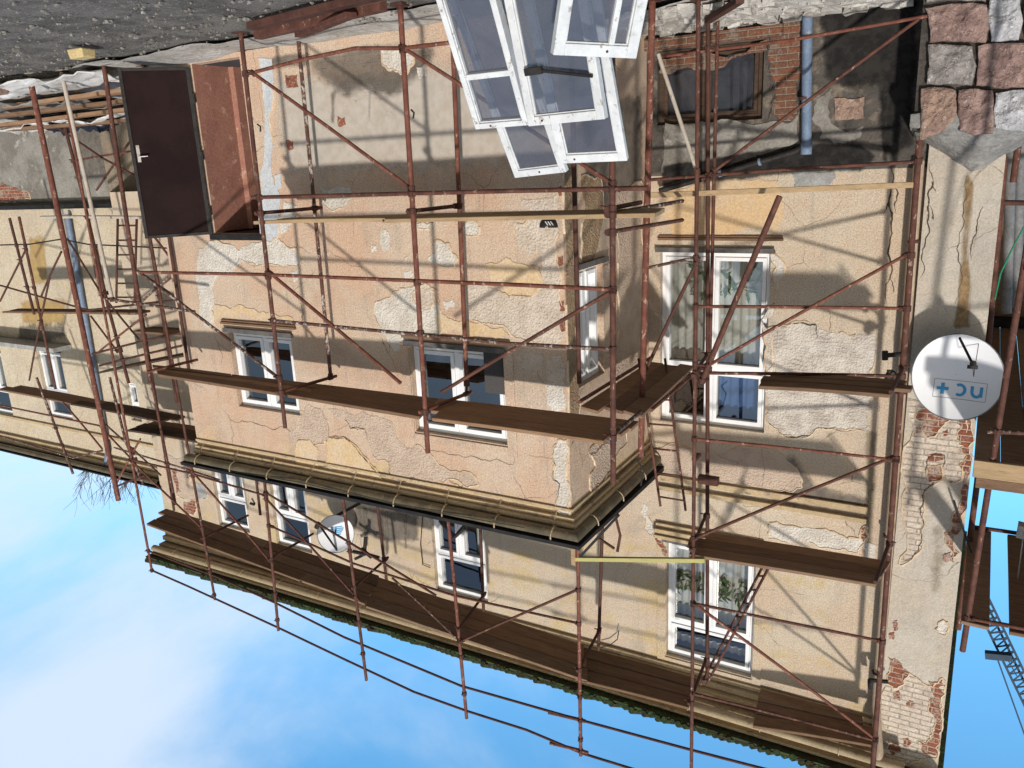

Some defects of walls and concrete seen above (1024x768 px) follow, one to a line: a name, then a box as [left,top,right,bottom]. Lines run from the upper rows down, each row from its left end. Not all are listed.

flaking render [658,18,802,124]
peeling [249,202,302,283]
crack [883,168,899,303]
crack [920,166,936,278]
crack [956,188,983,300]
spalling [373,270,455,335]
crack [223,410,419,482]
peeling [767,521,877,558]
flaking render [898,408,975,566]
flaking render [881,657,947,765]